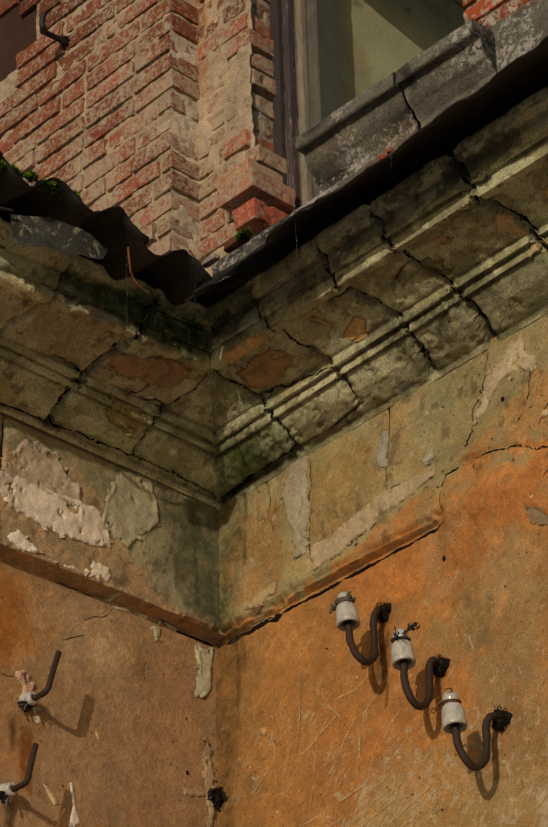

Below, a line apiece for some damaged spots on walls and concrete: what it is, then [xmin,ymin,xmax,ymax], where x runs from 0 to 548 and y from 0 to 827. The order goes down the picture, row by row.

crack [452,155,548,252]
crack [317,246,435,367]
crack [369,210,490,323]
peeling [99,345,193,399]
crack [0,283,360,563]
peeling [472,334,548,426]
peeling [0,439,171,582]
peeling [275,419,444,571]
crack [176,353,548,651]
flaking render [15,670,34,693]
crack [54,581,113,640]
peeling [86,569,214,705]